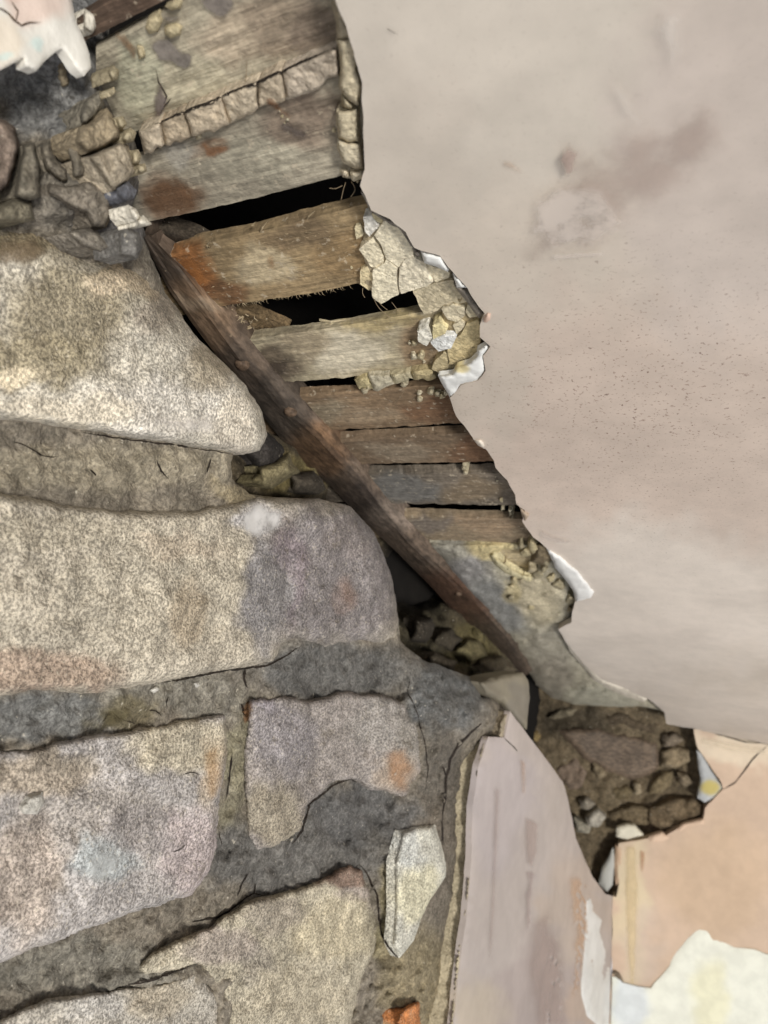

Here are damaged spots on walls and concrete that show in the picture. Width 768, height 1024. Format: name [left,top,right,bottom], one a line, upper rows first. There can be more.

water stain [539,192,614,240]
spalling [355,208,491,397]
spalling [503,535,594,612]
spalling [696,749,723,802]
spalling [598,817,704,892]